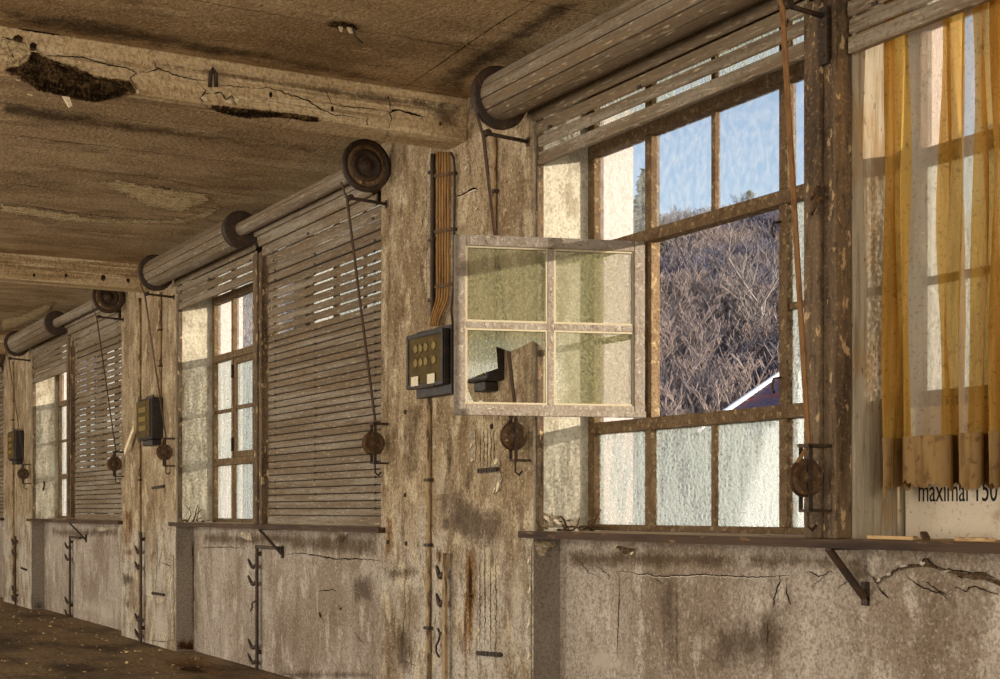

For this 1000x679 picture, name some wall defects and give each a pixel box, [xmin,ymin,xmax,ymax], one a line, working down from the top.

spalling [0,35,139,108]
spalling [200,85,331,122]
crack [139,0,536,136]
crack [290,553,378,561]
corrosion [464,550,476,670]
crack [577,556,848,653]